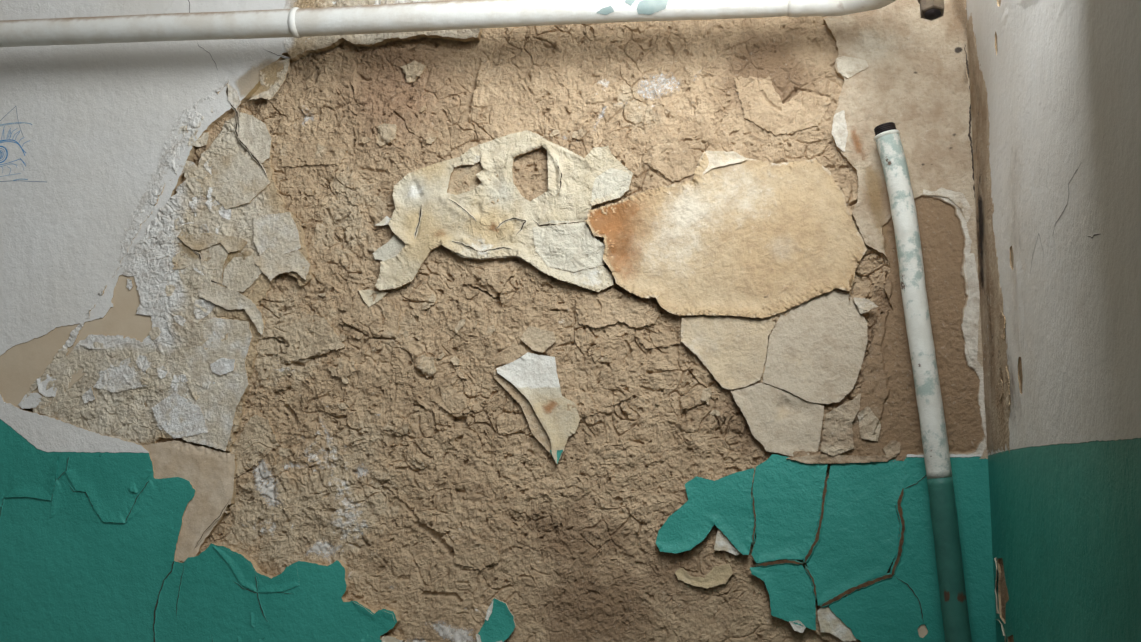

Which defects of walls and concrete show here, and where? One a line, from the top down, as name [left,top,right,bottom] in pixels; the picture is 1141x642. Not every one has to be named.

water stain [787,0,1013,464]
crack [1030,165,1080,272]
spalling [0,0,910,642]
crack [152,561,185,642]
crack [232,576,293,622]
crack [751,474,927,622]
peeling [994,558,1014,642]